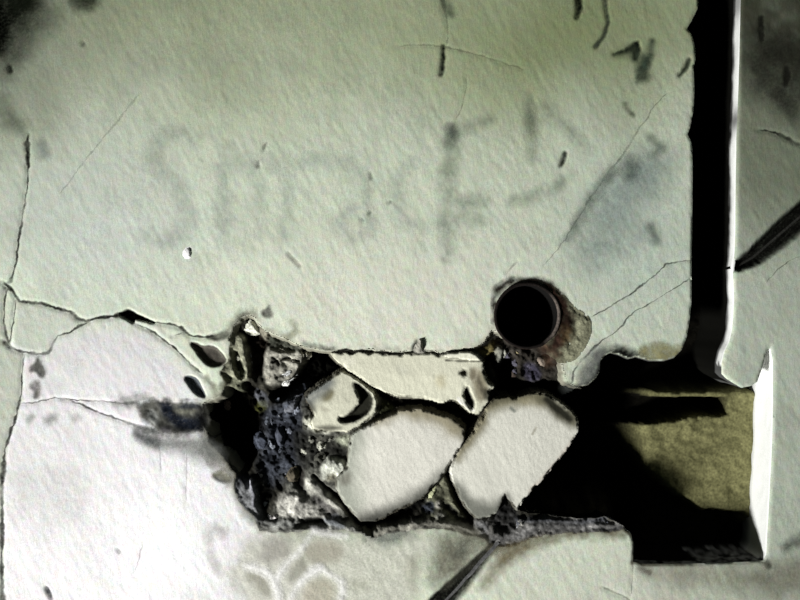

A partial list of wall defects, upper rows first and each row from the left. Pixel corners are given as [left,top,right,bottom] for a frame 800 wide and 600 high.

crack [0,374,23,600]
crack [2,136,119,354]
crack [141,323,213,372]
flaking render [120,306,624,600]
rust [491,278,573,363]